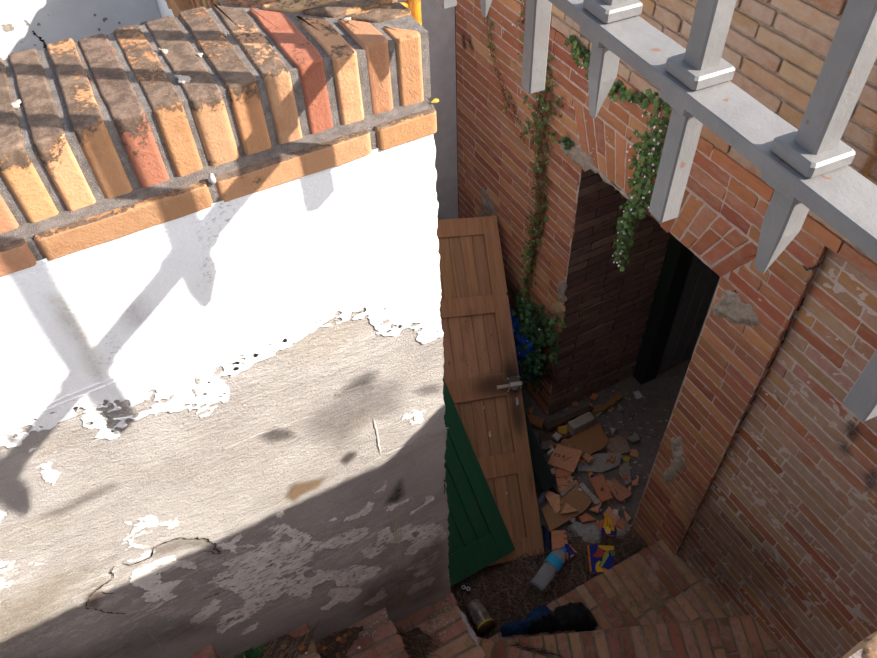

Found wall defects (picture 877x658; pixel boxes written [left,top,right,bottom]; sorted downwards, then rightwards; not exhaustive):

spalling [711,290,761,327]
crack [768,298,805,369]
peeling [0,308,451,658]
crack [86,537,221,614]